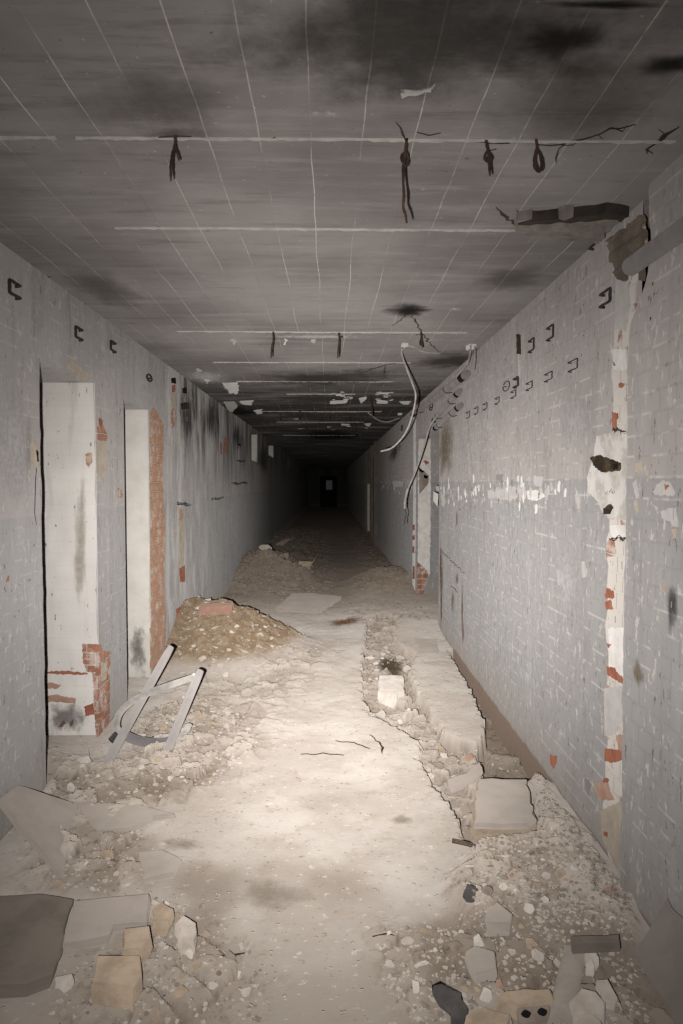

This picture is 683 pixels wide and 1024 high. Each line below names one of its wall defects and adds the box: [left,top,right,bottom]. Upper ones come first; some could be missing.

crack [538,124,679,163]
spalling [514,202,648,282]
crack [392,314,438,351]
peeling [330,392,411,405]
spalling [590,455,621,473]
peeling [381,416,581,594]
flaking render [150,378,189,671]
flaking render [604,588,614,610]
flaking render [45,644,111,737]
flaking render [606,666,623,684]
crack [301,735,384,756]
flaking render [604,735,622,763]